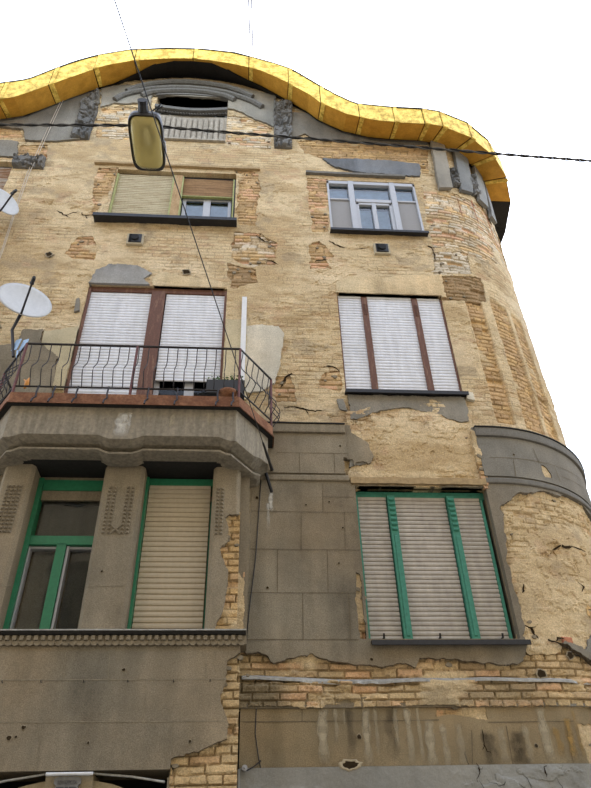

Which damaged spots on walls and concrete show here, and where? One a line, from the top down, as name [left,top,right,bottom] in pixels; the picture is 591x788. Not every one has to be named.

flaking render [65,237,100,260]
flaking render [227,171,277,289]
flaking render [421,185,507,306]
flaking render [345,399,489,492]
flaking render [169,492,591,788]
water stain [318,711,336,755]
water stain [404,710,445,761]